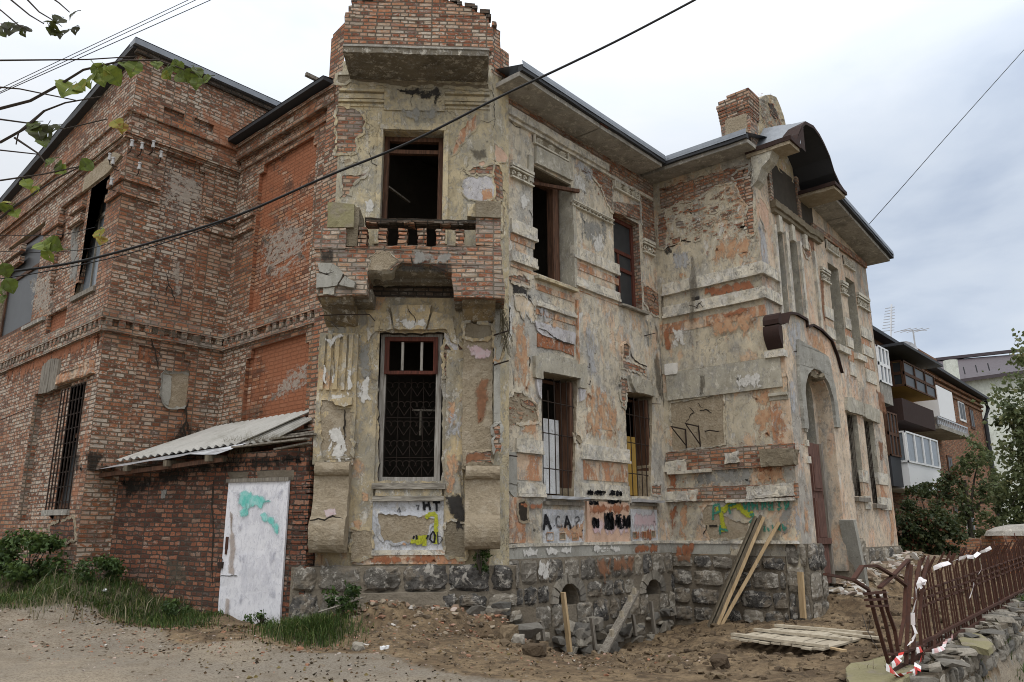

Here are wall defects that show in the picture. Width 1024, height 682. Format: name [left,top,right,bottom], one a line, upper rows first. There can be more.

spalling [333,105,369,197]
peeling [461,143,508,239]
spalling [640,161,770,260]
spalling [316,365,371,460]
spalling [348,272,584,565]
peeling [749,467,791,484]